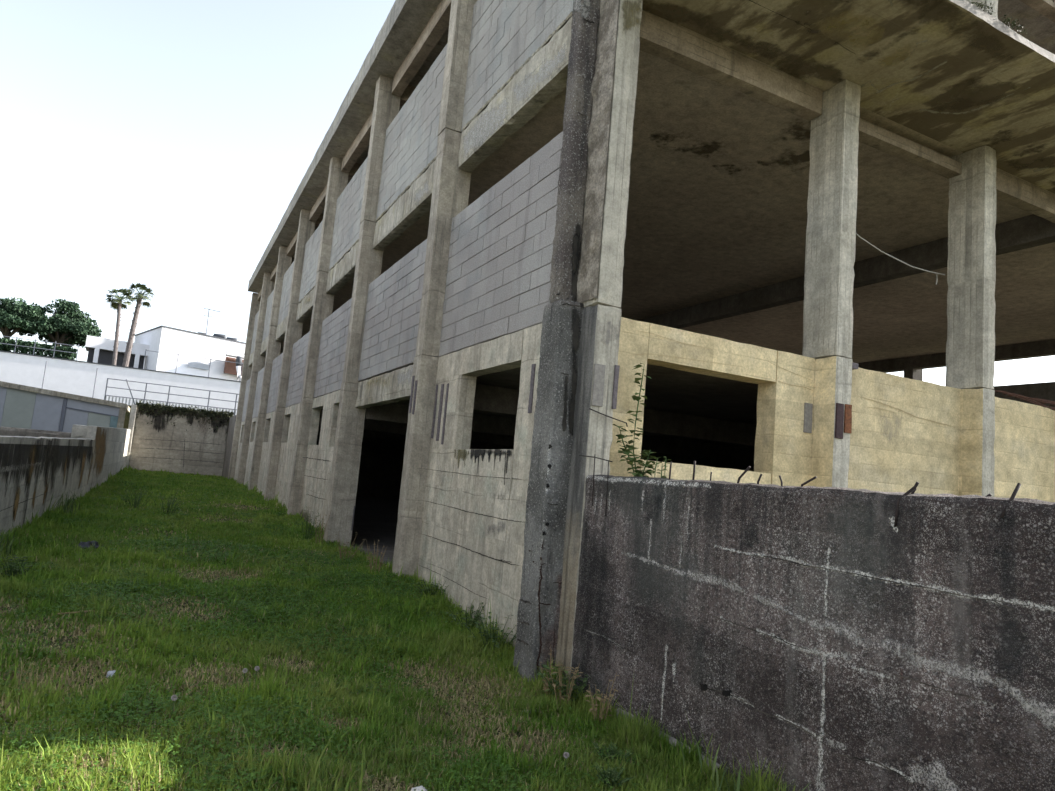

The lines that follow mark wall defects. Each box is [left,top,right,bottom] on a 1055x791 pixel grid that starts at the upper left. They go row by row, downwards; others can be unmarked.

leakage [622,0,842,83]
leakage [899,0,1013,62]
leakage [920,79,1031,114]
spalling [573,0,619,303]
leakage [761,122,811,166]
leakage [562,224,585,435]
leakage [0,438,93,524]
leakage [454,449,511,485]
crack [409,467,562,676]
crack [714,545,1055,612]
crack [699,609,988,702]
crack [707,688,913,782]